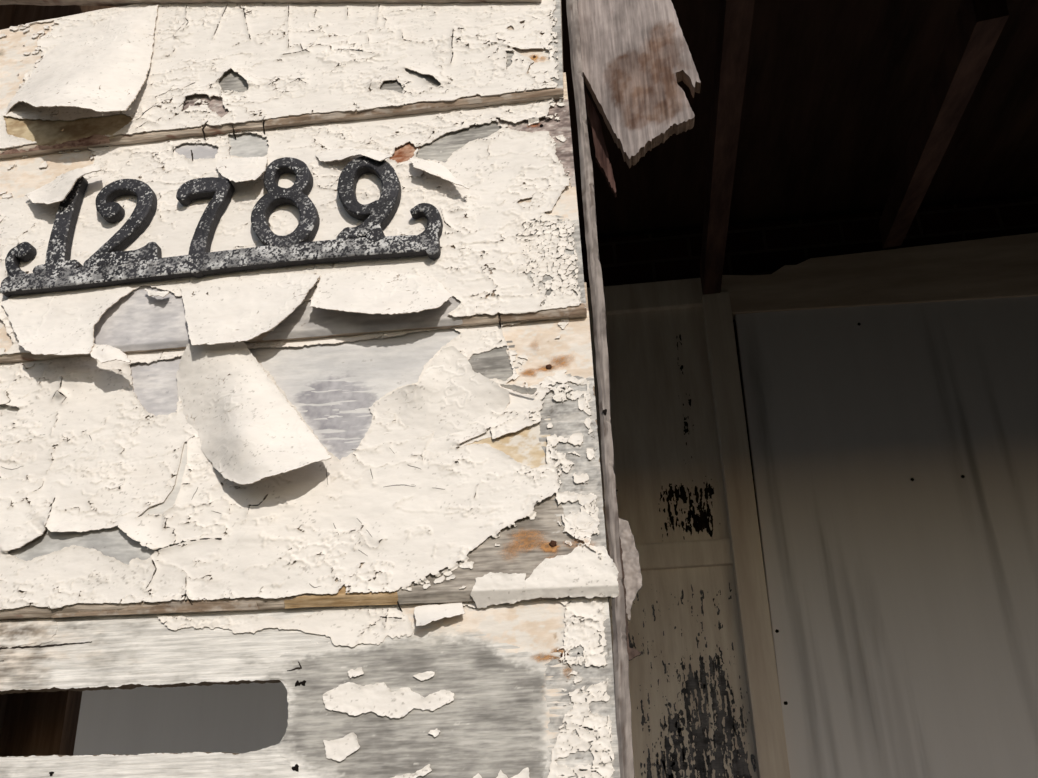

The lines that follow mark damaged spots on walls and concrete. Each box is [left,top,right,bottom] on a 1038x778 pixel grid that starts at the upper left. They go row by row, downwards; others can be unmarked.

rust [523,357,566,375]
rust [516,532,559,552]